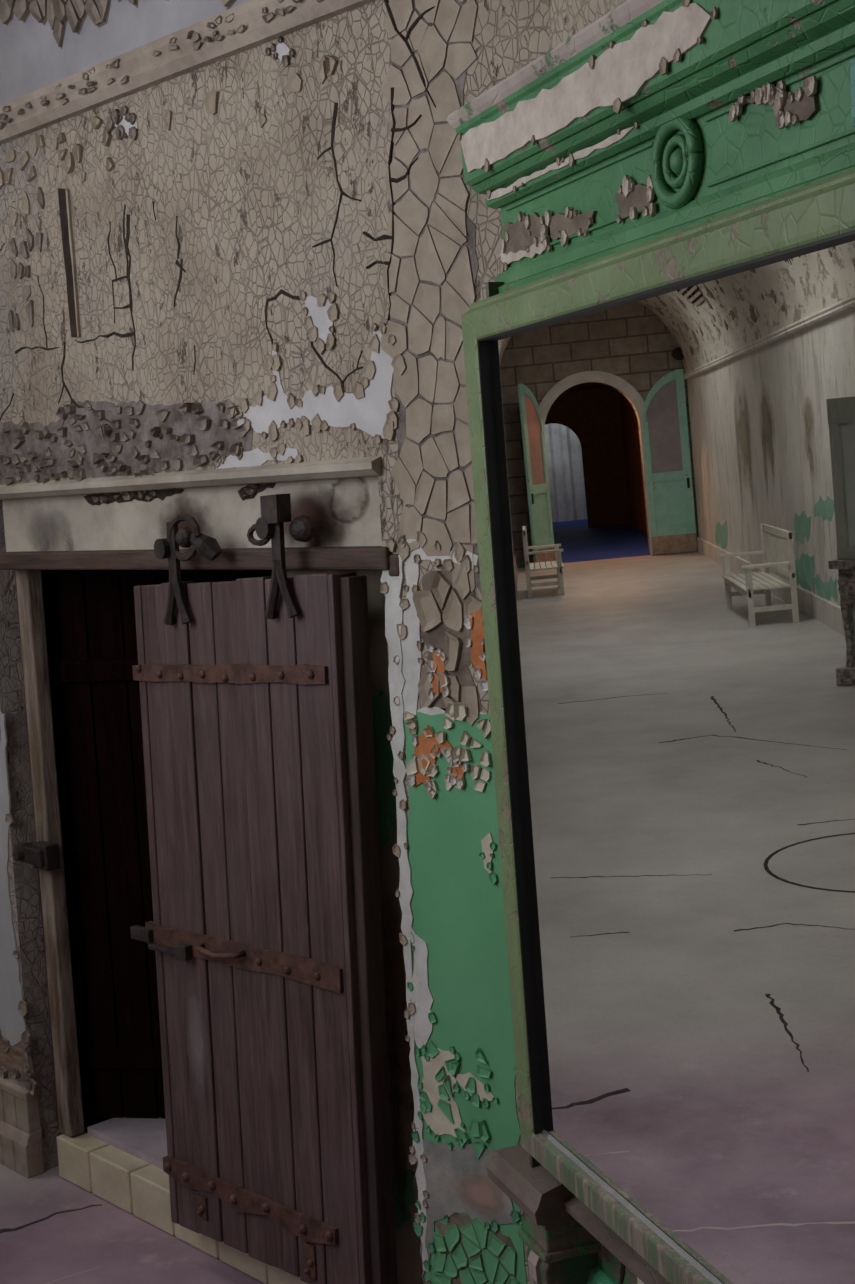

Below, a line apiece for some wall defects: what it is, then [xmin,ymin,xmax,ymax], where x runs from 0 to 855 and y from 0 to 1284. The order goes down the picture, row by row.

flaking render [0,0,323,131]
peeling [265,37,338,92]
peeling [0,132,86,332]
crack [15,201,186,426]
peeling [0,323,407,505]
crack [264,289,301,344]
crack [310,0,482,726]
peeling [380,531,523,1284]
spalling [0,1000,37,1095]